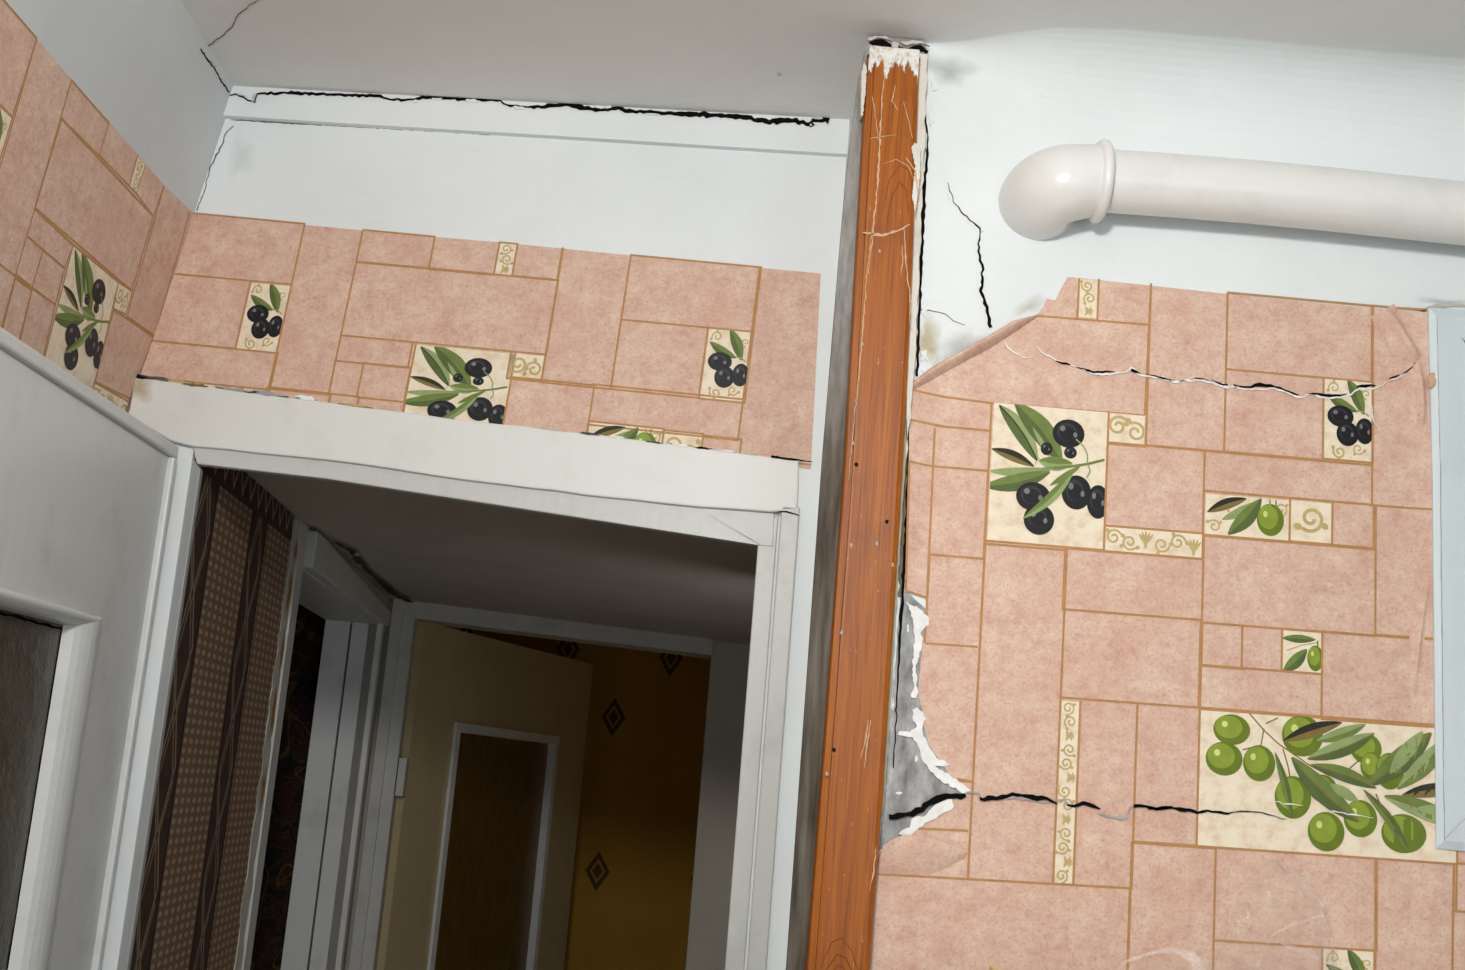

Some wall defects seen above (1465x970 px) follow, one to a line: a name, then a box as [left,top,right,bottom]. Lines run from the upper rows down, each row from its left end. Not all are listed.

crack [196,0,830,211]
crack [915,53,1415,431]
crack [893,428,909,768]
peeling [877,591,970,875]
crack [889,791,1371,820]